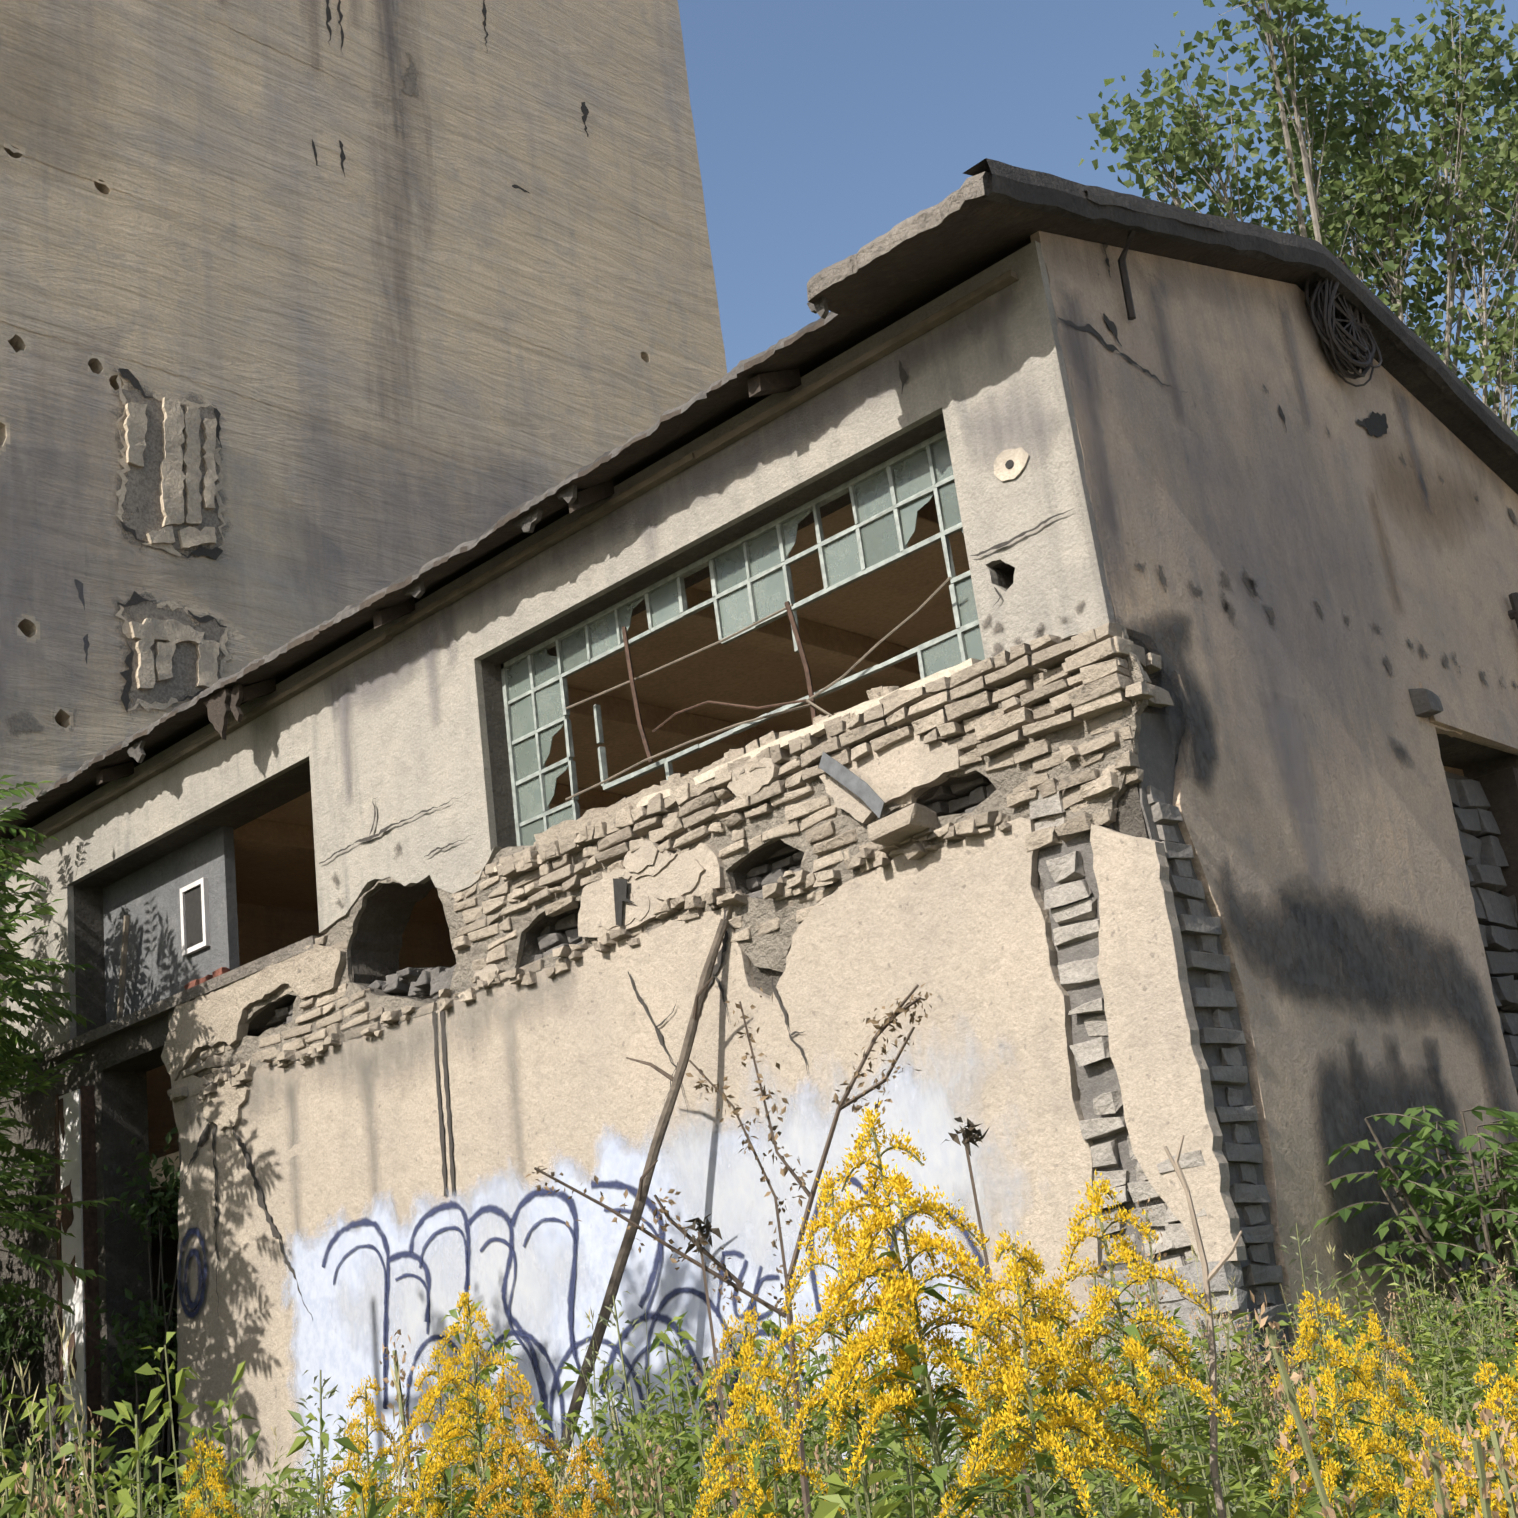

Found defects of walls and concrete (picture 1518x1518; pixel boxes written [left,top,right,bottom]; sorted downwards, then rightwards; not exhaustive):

crack [1102,242,1110,276]
crack [1058,313,1188,393]
spalling [114,368,229,560]
spalling [114,591,232,712]
spalling [1135,563,1167,592]
spalling [1221,571,1275,624]
spalling [161,601,1315,1516]
crack [181,1122,313,1320]